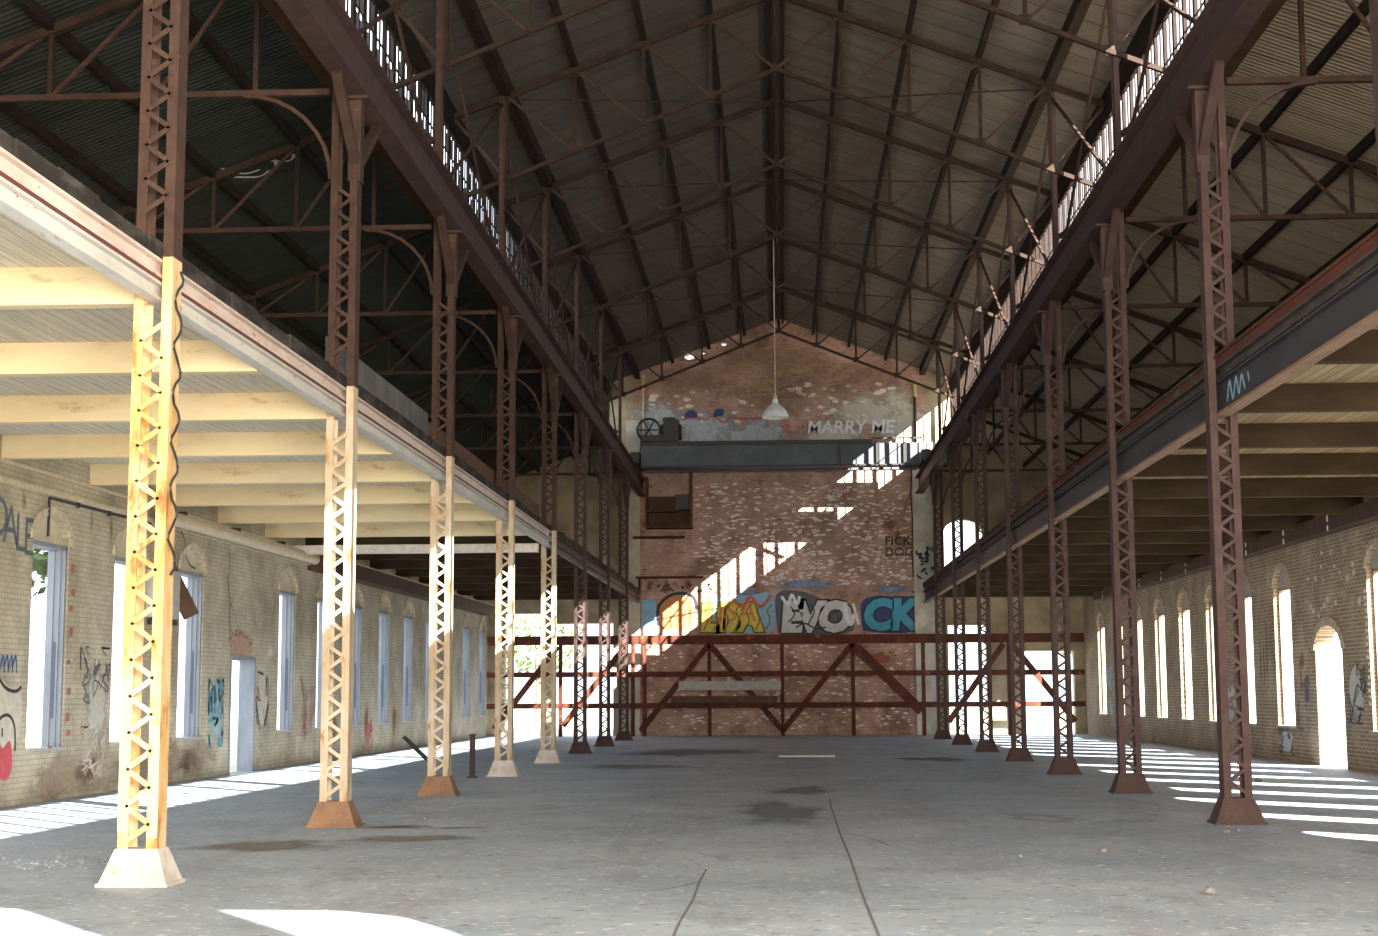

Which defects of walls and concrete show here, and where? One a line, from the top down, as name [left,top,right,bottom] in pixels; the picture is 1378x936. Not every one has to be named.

corrosion [923,234,1378,587]
peeling [36,746,119,798]
peeling [168,738,214,779]
crack [829,799,887,936]